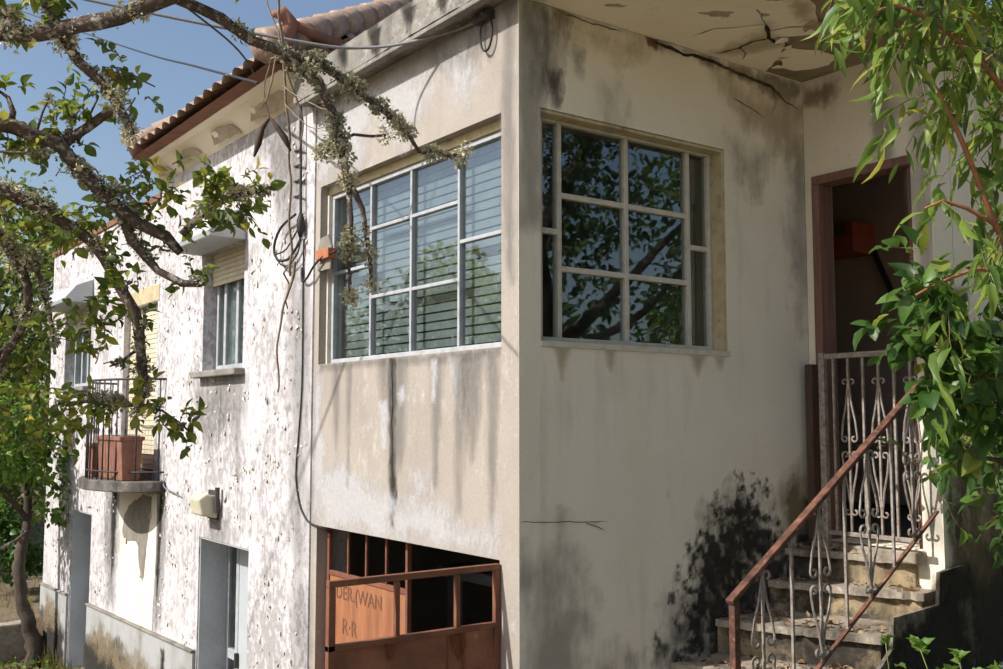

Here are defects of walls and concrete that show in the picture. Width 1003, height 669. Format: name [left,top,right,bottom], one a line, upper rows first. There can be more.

leakage [542,9,560,99]
crack [559,11,619,31]
peeling [698,11,733,22]
crack [646,11,799,117]
peeling [157,354,258,470]
leakage [312,358,478,543]
peeling [52,436,197,631]
crack [523,521,607,530]
leakage [84,625,146,669]